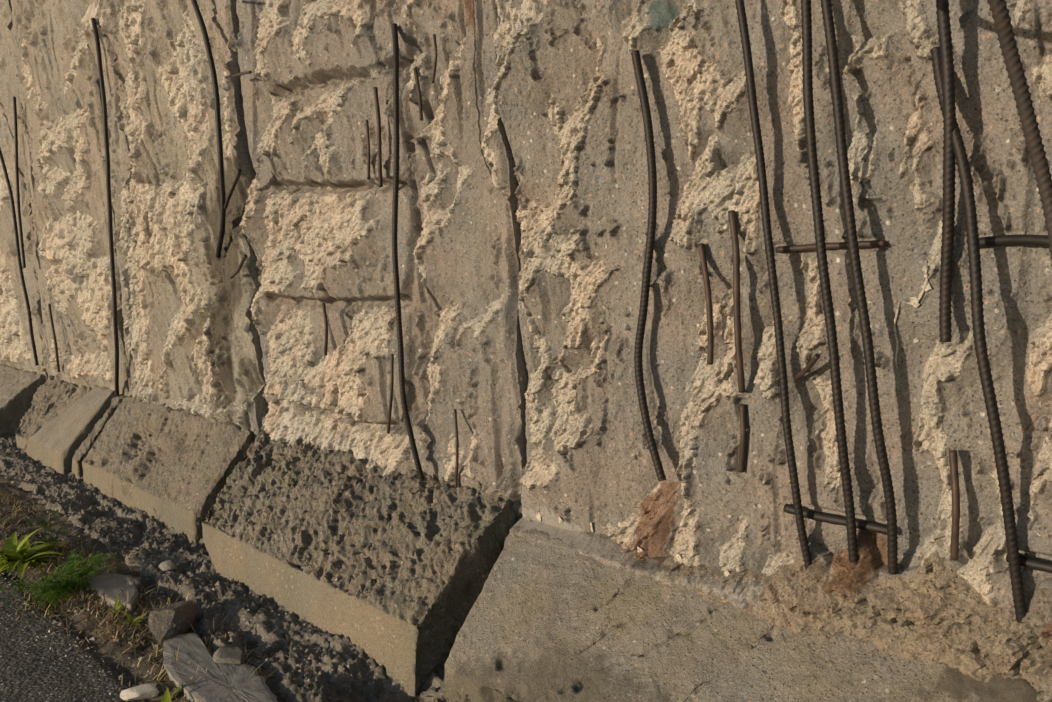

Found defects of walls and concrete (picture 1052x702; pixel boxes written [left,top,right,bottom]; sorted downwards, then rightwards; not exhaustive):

spalling [21,0,264,426]
spalling [264,297,503,481]
spalling [411,38,476,282]
spalling [481,0,547,195]
spalling [515,35,623,490]
spalling [620,0,760,255]
spalling [516,288,1052,702]
spalling [779,0,806,143]
spalling [796,252,840,488]
rust [826,531,888,592]
spalling [847,93,881,199]
spalling [894,221,954,368]